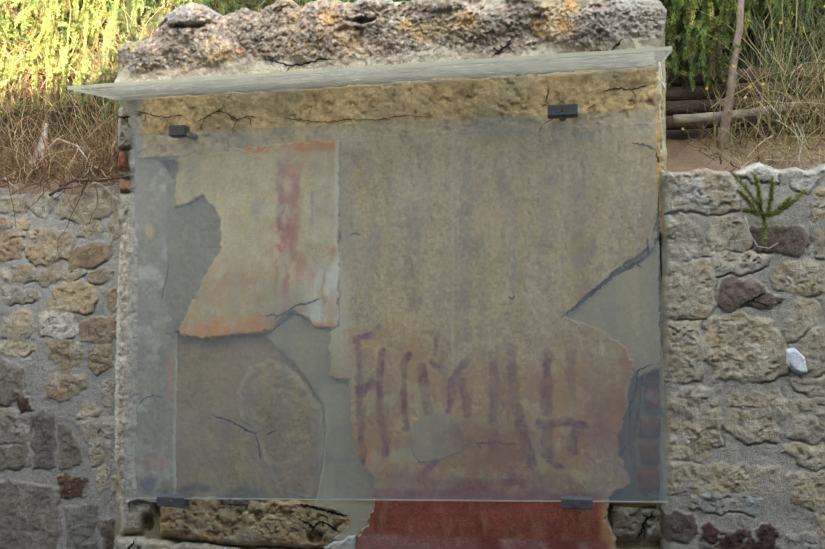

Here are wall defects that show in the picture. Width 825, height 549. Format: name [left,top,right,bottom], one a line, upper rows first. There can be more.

crack [118,102,435,129]
crack [586,84,651,110]
crack [265,298,320,320]
spalling [566,237,663,379]
spalling [165,182,324,507]
crack [561,192,663,496]
crack [212,414,277,459]
spalling [323,535,358,549]